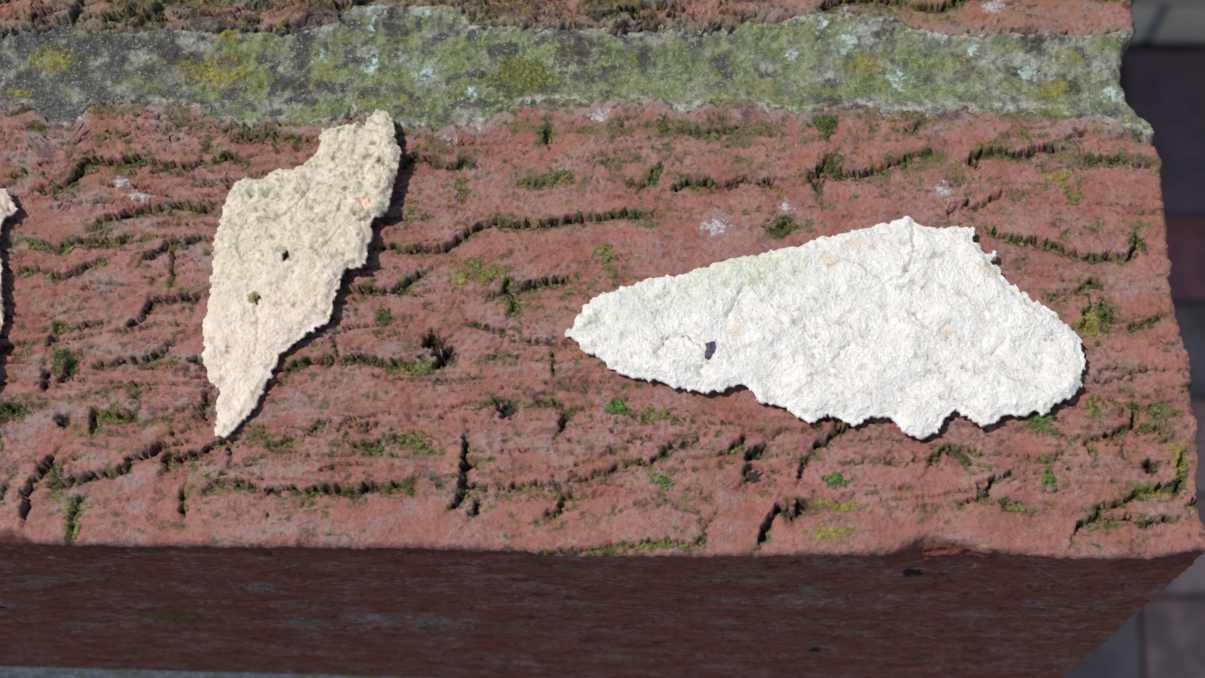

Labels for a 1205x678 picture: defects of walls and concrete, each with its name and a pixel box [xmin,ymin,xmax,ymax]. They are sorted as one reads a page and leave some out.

peeling [0,189,19,235]
peeling [202,108,402,439]